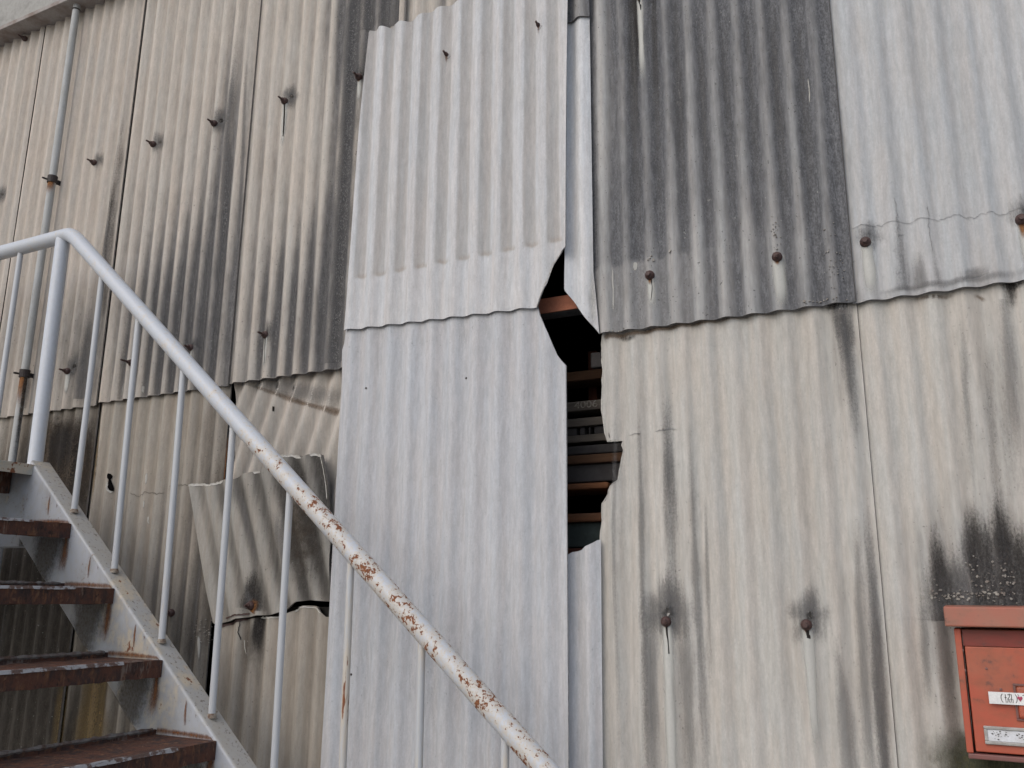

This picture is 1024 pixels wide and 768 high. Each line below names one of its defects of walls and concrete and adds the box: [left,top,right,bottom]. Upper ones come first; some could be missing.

damp [630,0,657,153]
damp [257,0,399,414]
crack [852,198,1023,251]
damp [773,255,786,302]
damp [605,321,706,340]
spalling [601,342,623,518]
corrosion [34,536,68,582]
damp [931,505,1024,621]
corrosion [73,603,111,650]
crack [222,606,320,640]
corrosion [118,678,158,724]
corrosion [157,704,212,740]